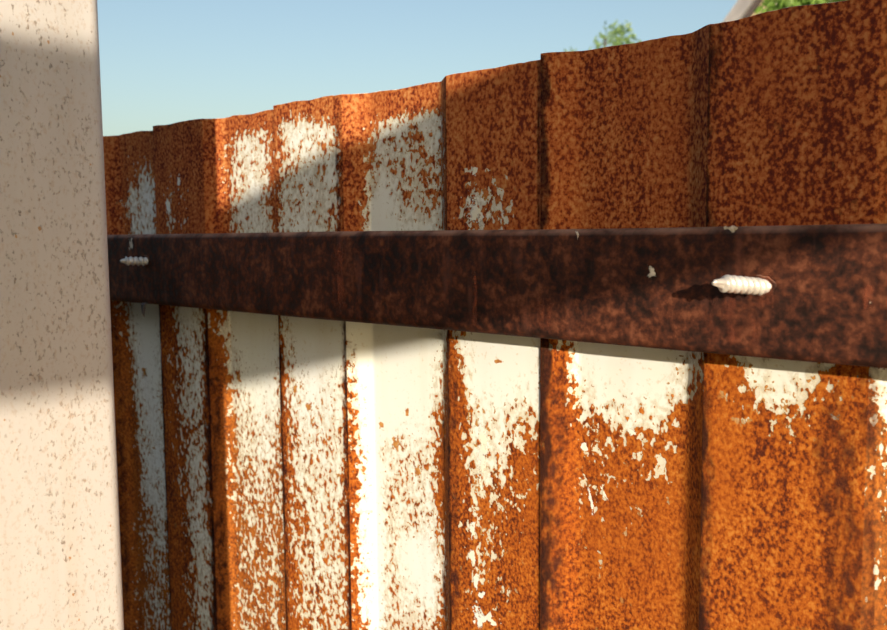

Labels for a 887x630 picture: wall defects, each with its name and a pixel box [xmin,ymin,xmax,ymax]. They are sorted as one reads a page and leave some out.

rust [110,301,887,630]